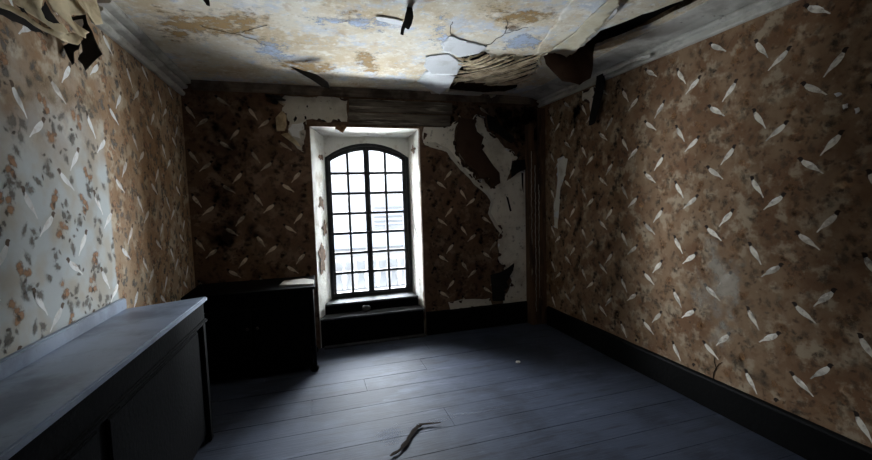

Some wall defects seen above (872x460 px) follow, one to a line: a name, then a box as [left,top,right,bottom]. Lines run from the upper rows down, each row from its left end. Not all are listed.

leakage [155,6,266,41]
leakage [282,60,335,73]
peeling [417,17,542,98]
peeling [303,118,346,133]